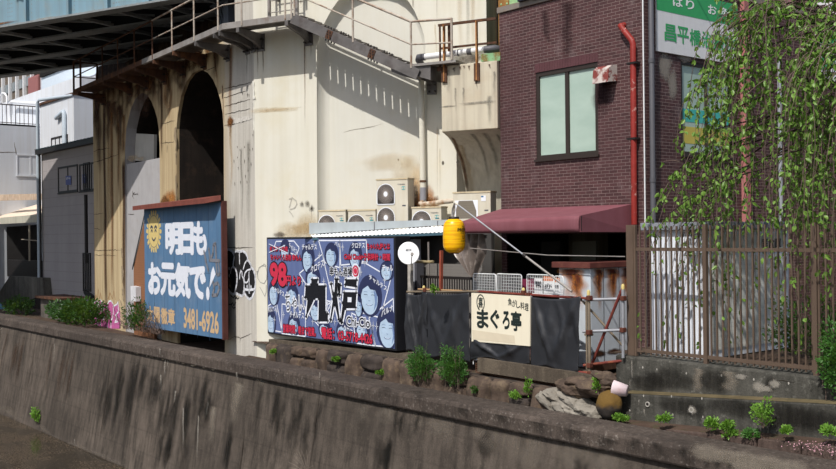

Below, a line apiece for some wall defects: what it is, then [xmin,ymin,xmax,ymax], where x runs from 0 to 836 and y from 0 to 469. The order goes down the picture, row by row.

rust [94,101,125,294]
rust [562,269,583,296]
rust [594,268,627,297]